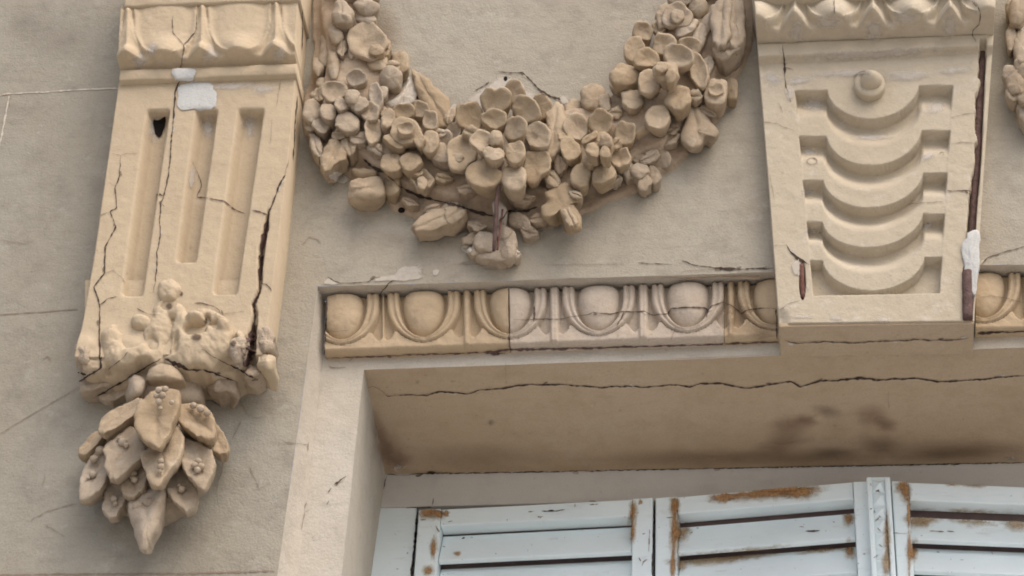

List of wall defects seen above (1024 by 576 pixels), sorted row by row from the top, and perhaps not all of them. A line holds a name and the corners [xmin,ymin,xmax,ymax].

crack [476,71,568,103]
crack [137,16,197,315]
crack [363,159,552,230]
crack [0,80,298,439]
spalling [375,266,440,281]
spalling [962,269,973,321]
crack [324,276,1024,403]
rust [670,499,681,576]
rust [712,487,809,502]
rust [899,481,916,576]